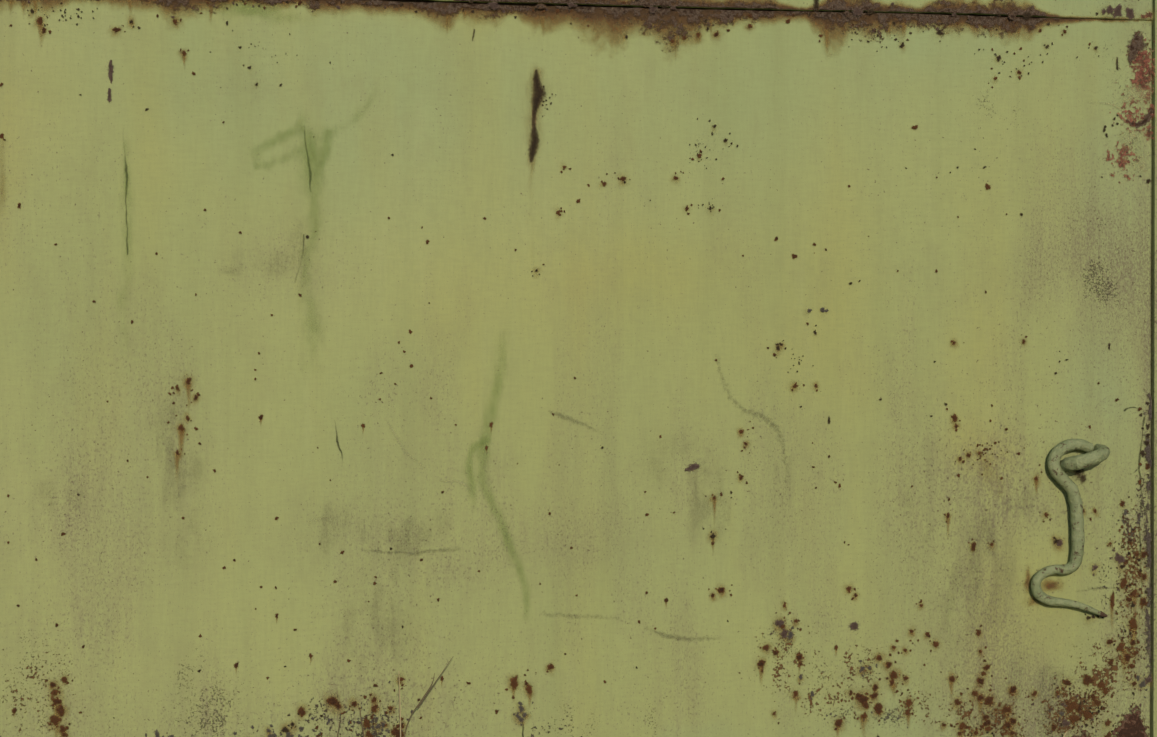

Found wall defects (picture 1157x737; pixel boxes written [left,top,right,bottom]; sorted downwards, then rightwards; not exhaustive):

rust [0,0,1152,88]
rust [167,374,201,467]
rust [955,428,1025,480]
rust [45,677,73,737]
rust [251,677,422,737]
rust [757,602,832,700]
rust [824,629,939,737]
rust [939,490,1152,737]